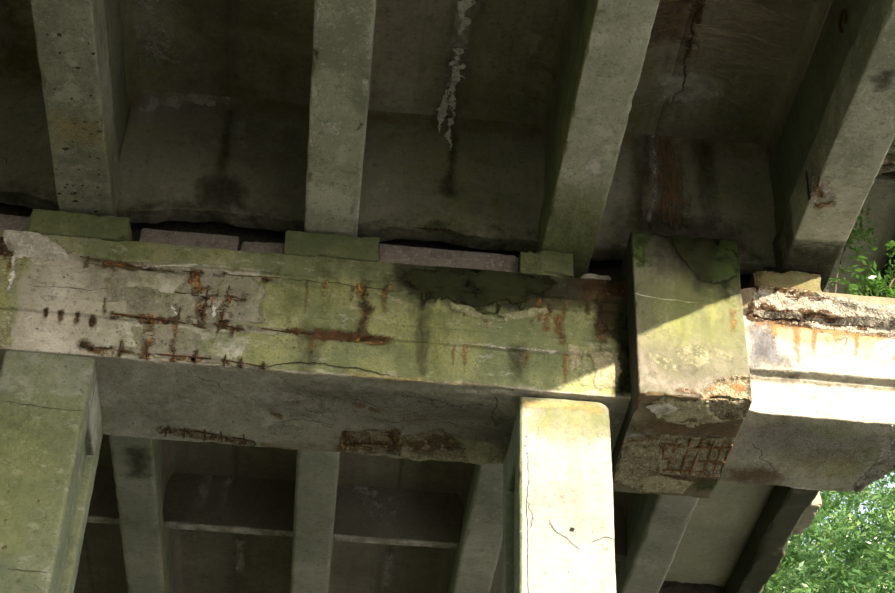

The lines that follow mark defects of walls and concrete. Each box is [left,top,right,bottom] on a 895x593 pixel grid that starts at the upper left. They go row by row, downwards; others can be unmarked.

damp [436,0,478,162]
crack [668,0,705,103]
spalling [0,230,298,370]
corrosion [285,280,393,348]
peeling [449,300,549,322]
corrosion [754,321,883,354]
spalling [747,286,895,339]
spalling [338,428,505,465]
spalling [614,374,752,494]
spalling [789,425,895,492]